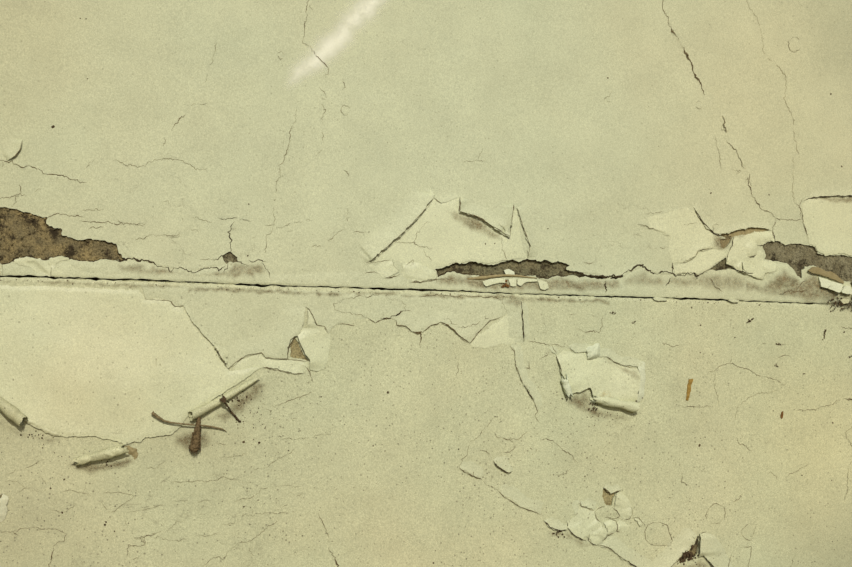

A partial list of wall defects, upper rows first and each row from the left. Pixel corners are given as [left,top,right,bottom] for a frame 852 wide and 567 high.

crack [302,0,346,114]
crack [662,2,705,95]
crack [715,2,808,236]
crack [0,160,89,205]
crack [49,104,297,277]
peeling [357,187,623,290]
peeling [647,203,773,275]
peeling [763,186,852,304]
peeling [0,207,542,466]
crack [333,294,507,328]
peeling [542,342,646,413]
peeling [460,461,733,567]